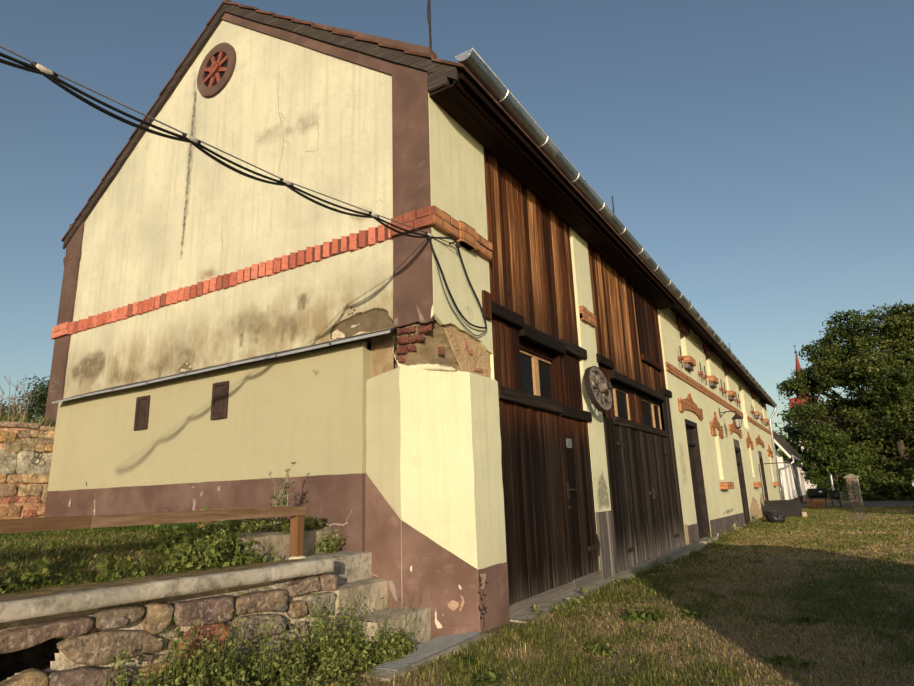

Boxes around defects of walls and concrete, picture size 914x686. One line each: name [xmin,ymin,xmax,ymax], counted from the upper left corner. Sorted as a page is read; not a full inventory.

damp [181,93,196,254]
damp [73,354,104,377]
spalling [330,303,491,378]
peeling [435,585,466,628]
peeling [478,573,489,629]